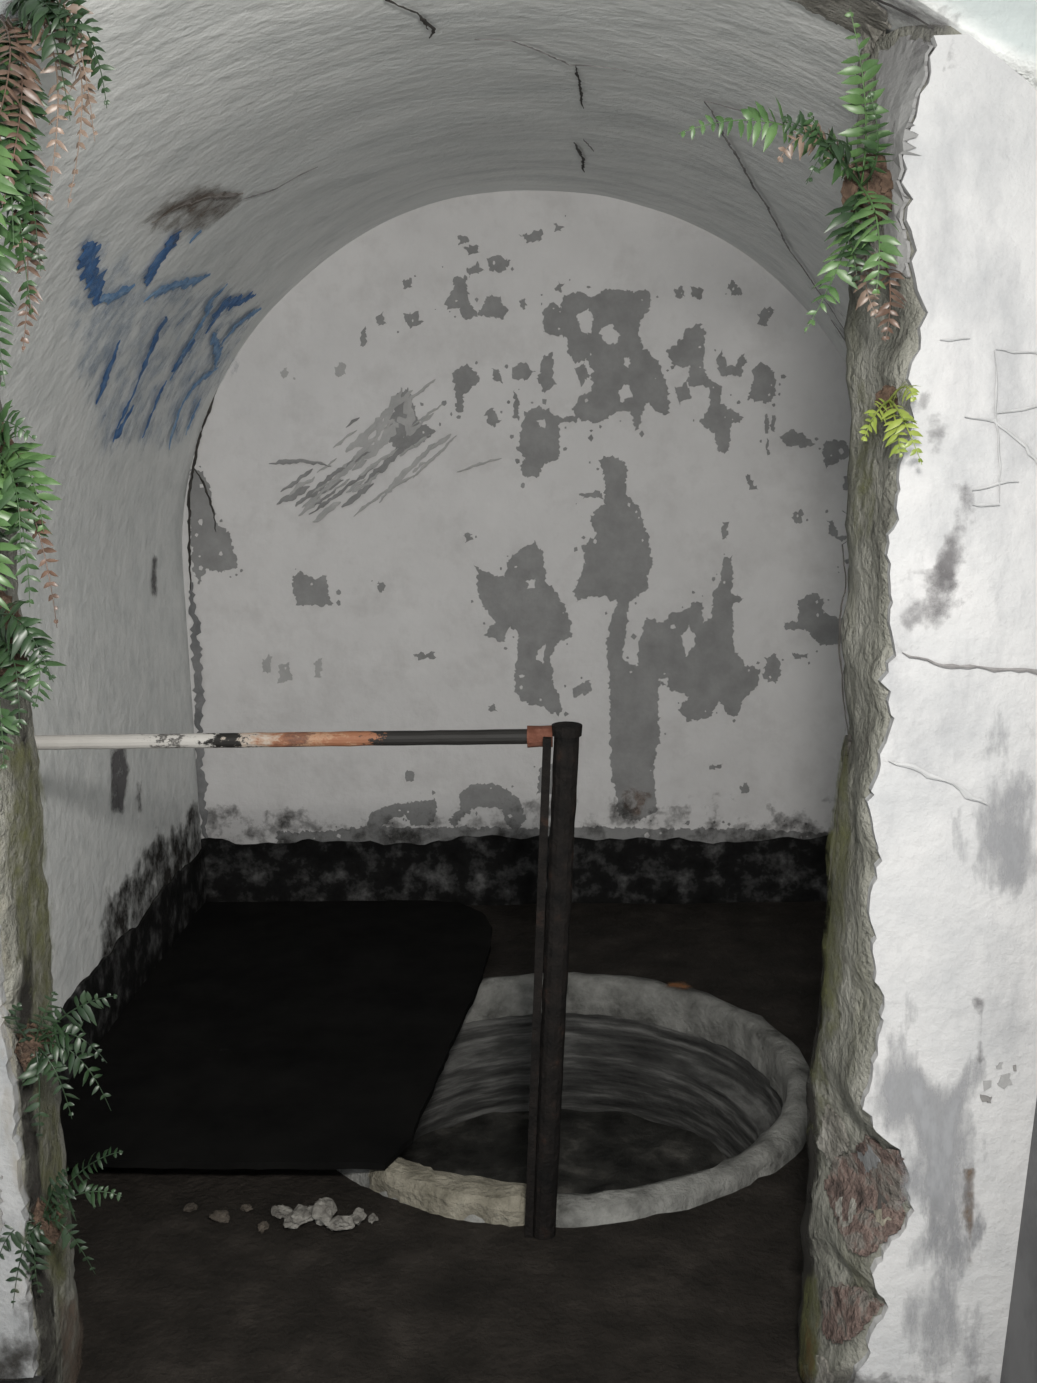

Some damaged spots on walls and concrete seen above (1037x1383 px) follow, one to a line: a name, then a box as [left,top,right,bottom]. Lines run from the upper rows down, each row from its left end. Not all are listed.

crack [385,0,436,39]
crack [475,39,626,172]
peeling [520,215,566,243]
crack [704,101,845,341]
peeling [360,235,849,490]
leakage [932,537,957,616]
peeling [413,651,436,660]
peeling [471,455,842,844]
crack [902,652,1037,675]
peeling [275,783,550,845]
leakage [982,788,1027,885]
spalling [816,1104,908,1256]